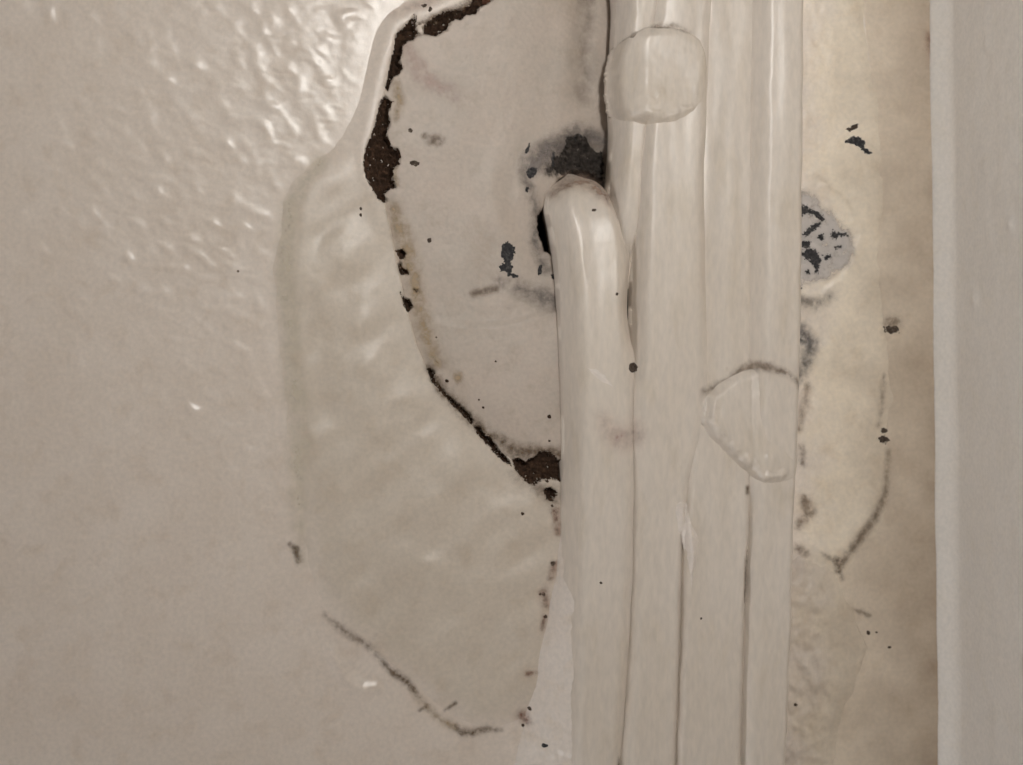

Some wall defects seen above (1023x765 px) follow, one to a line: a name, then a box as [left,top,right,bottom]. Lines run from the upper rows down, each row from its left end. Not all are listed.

flaking render [380,0,611,468]
leakage [525,134,596,193]
peeling [792,0,899,578]